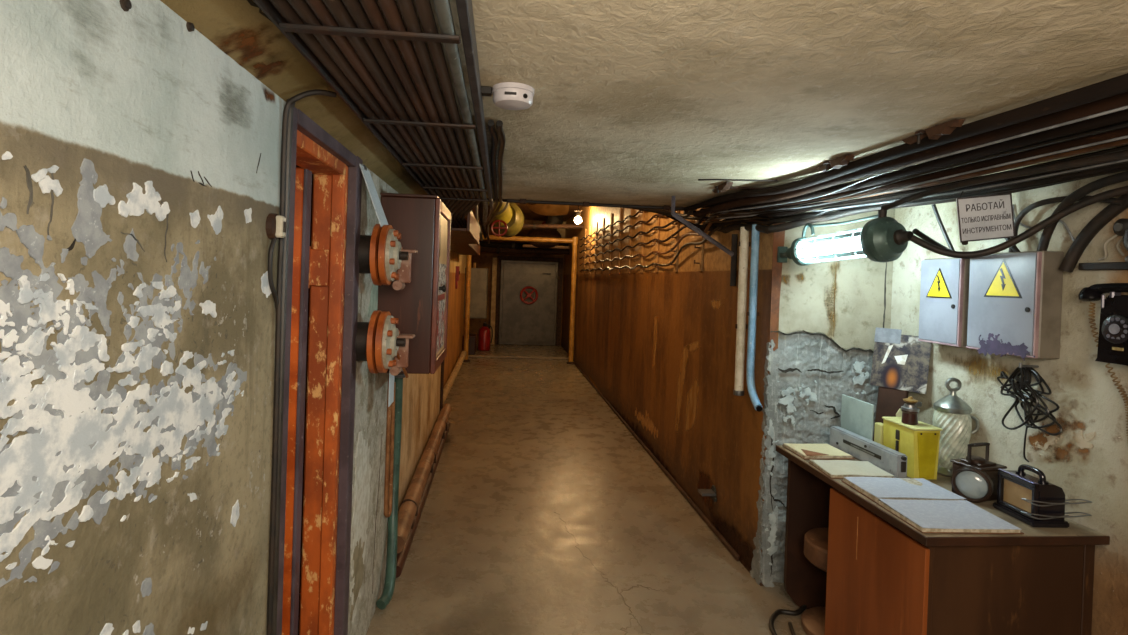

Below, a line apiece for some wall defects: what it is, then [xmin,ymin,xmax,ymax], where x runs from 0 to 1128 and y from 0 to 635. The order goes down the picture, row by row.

peeling [0,158,247,587]
peeling [141,577,152,597]
spalling [750,331,879,587]